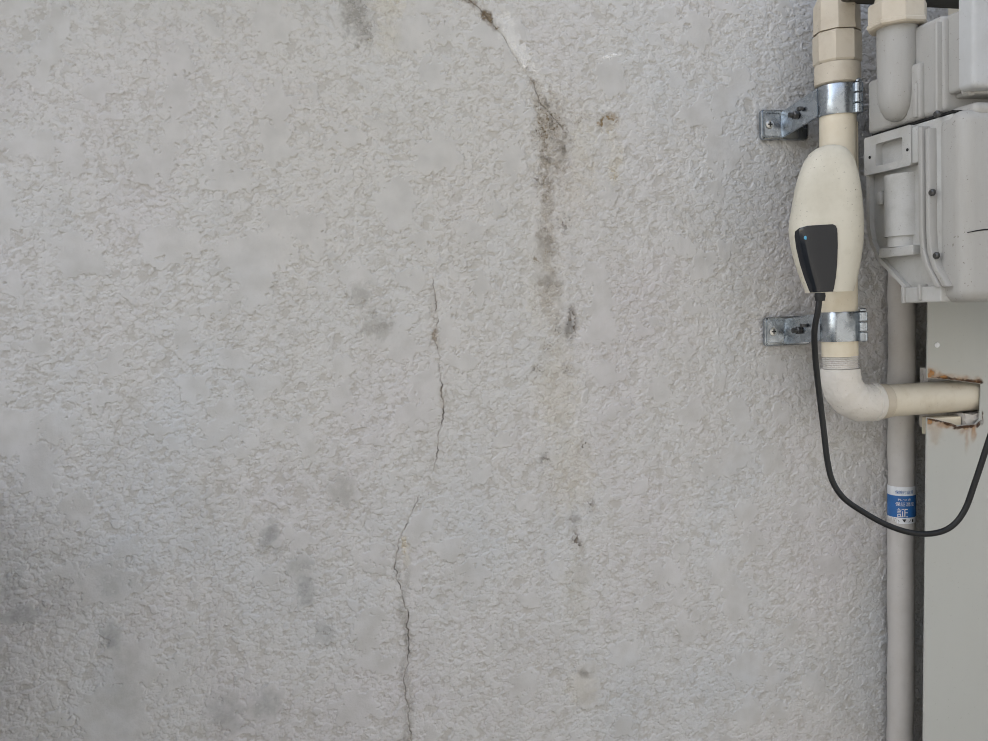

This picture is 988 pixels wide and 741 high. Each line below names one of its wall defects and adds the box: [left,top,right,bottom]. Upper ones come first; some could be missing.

leakage [530,98,567,152]